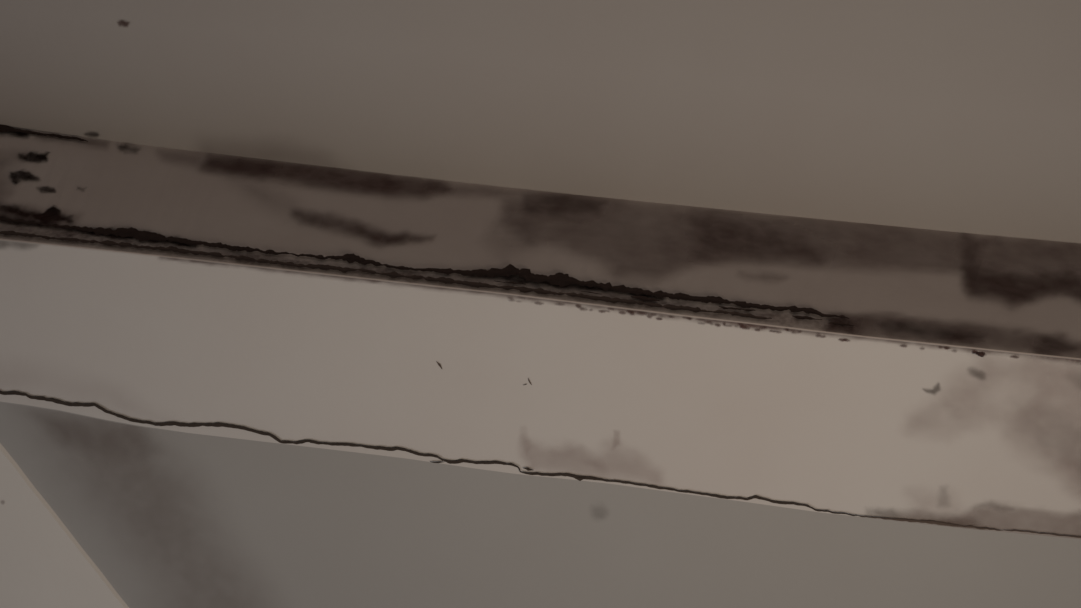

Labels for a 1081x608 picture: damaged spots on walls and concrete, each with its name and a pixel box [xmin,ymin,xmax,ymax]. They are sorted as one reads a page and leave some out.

mould [11,152,55,192]
mould [0,206,72,227]
water stain [707,314,873,338]
water stain [933,327,987,351]
crack [0,391,1081,538]